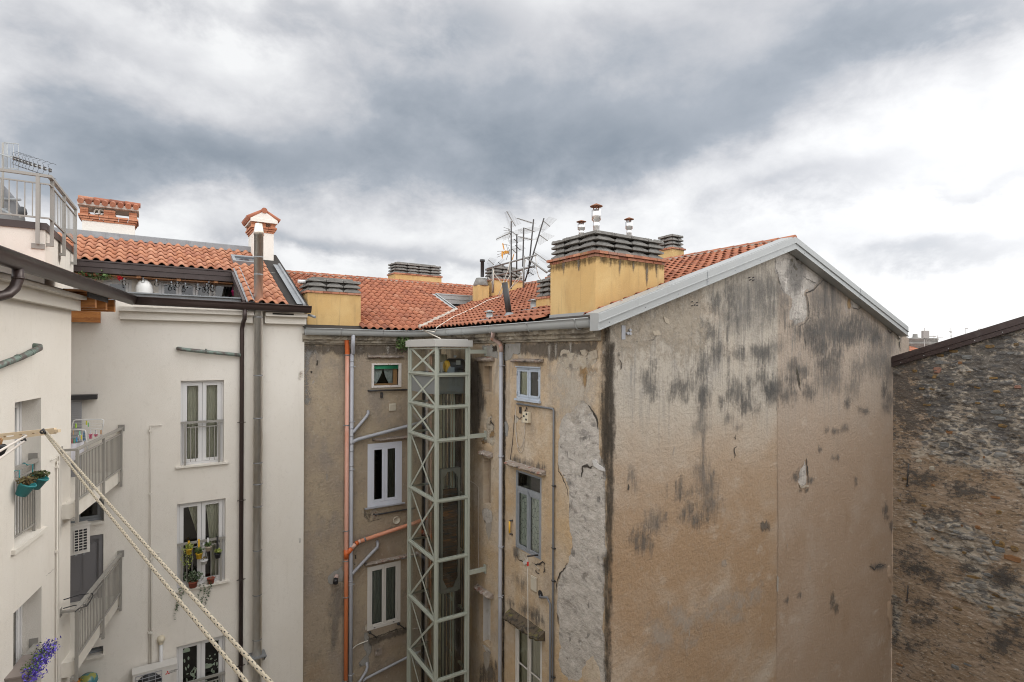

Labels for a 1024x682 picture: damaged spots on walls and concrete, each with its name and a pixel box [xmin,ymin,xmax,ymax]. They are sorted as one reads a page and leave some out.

damp [671,281,891,423]
peeling [556,401,607,682]
peeling [798,458,809,492]